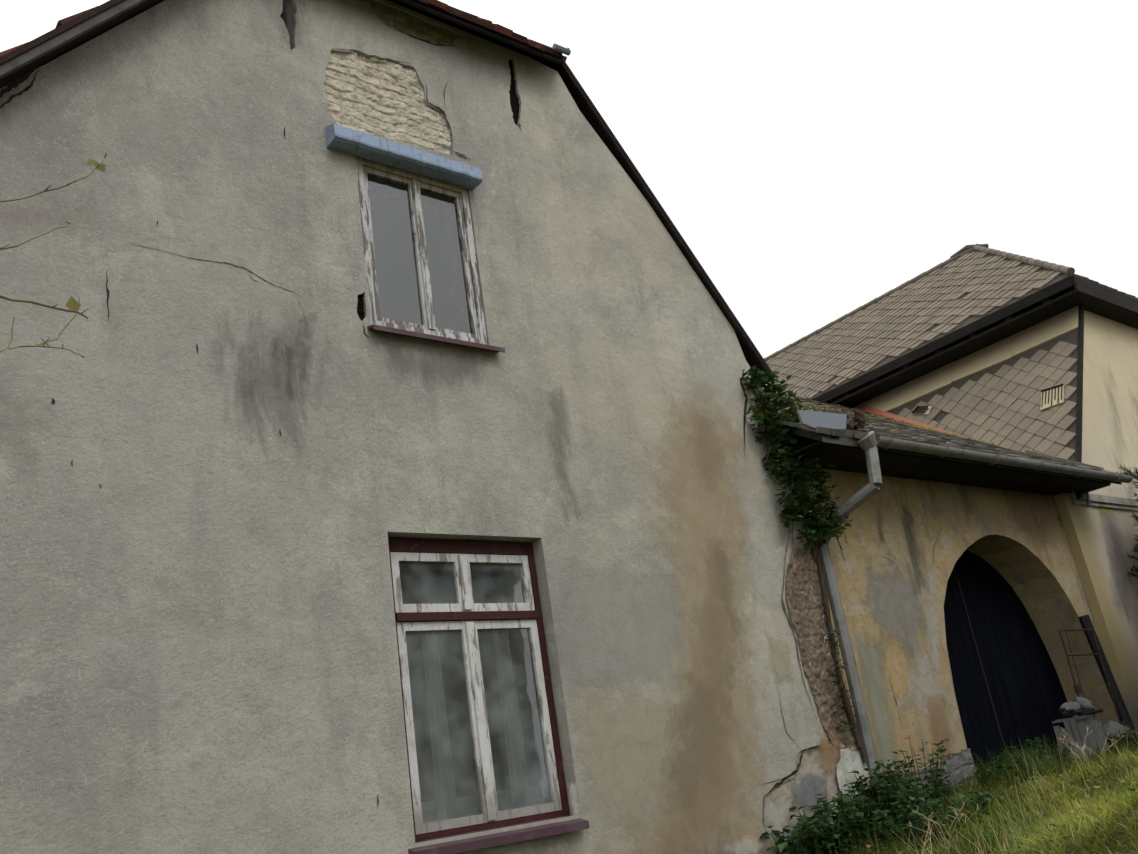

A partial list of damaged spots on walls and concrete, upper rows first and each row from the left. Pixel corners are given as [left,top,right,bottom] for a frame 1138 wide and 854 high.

crack [280,0,296,50]
crack [0,65,38,108]
flaking render [324,48,473,161]
crack [508,60,521,131]
crack [104,272,112,319]
crack [128,243,306,325]
spalling [357,294,368,337]
leakage [645,413,762,854]
leakage [904,510,940,712]
flaking render [755,544,870,854]